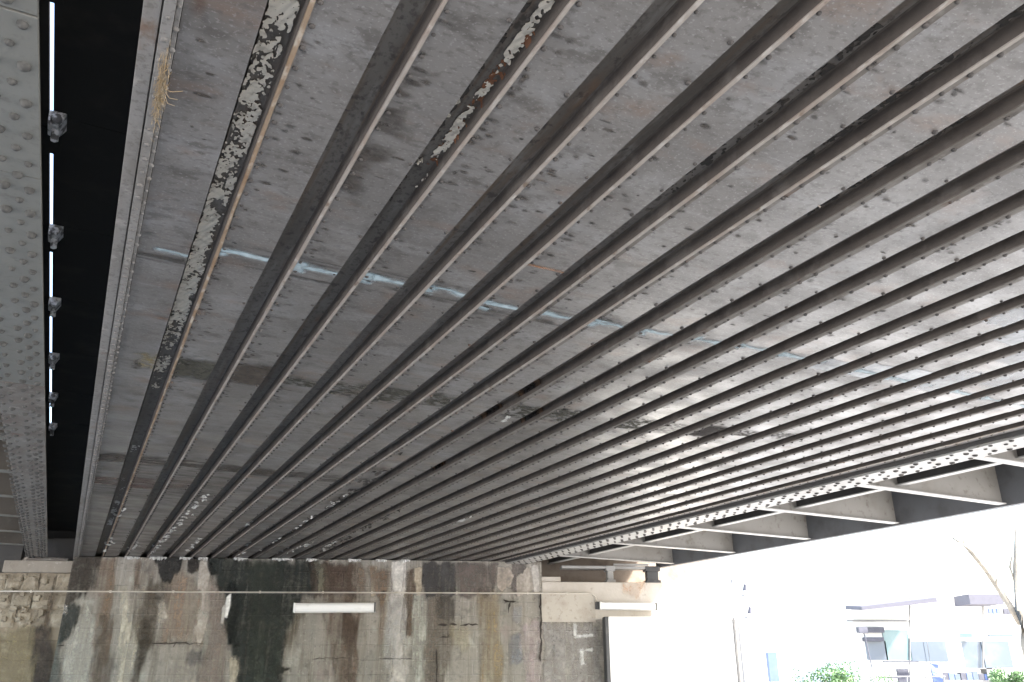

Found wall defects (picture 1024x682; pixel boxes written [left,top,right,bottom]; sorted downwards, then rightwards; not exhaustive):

peeling [389,0,555,201]
peeling [151,0,299,389]
water stain [0,556,329,682]
water stain [348,559,498,682]
water stain [512,564,525,596]